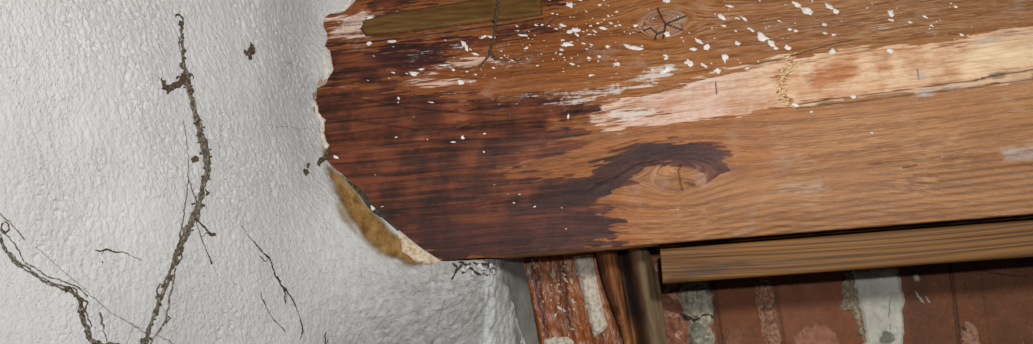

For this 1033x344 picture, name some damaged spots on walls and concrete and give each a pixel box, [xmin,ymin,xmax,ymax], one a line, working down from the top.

flaking render [322,47,334,80]
flaking render [314,102,339,159]
crack [0,13,216,344]
spalling [396,232,440,264]
crack [241,225,328,344]